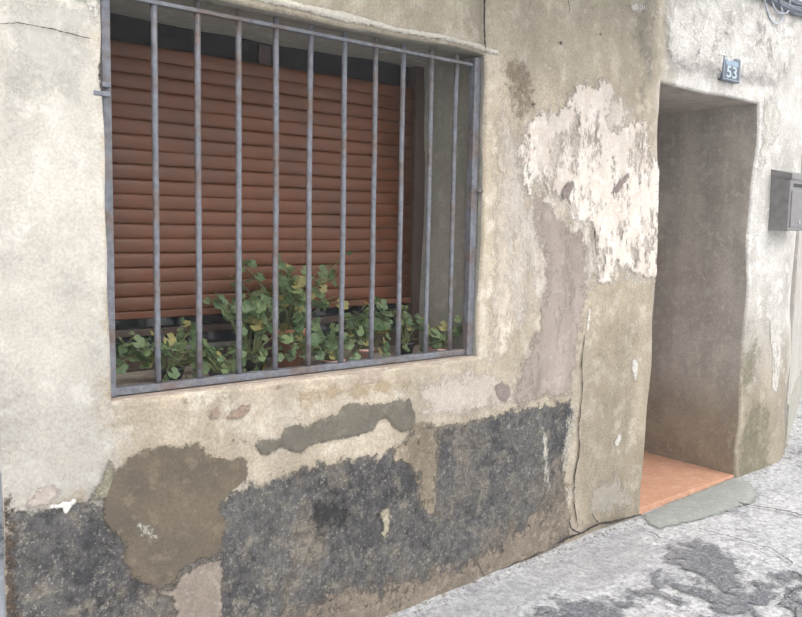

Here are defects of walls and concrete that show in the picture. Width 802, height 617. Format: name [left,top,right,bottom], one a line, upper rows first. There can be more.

crack [1,22,91,39]
crack [480,0,488,49]
peeling [391,61,659,516]
leakage [541,427,550,493]
leakage [561,408,577,471]
crack [478,334,673,575]
spalling [380,508,392,541]
crack [738,502,802,515]
spalling [161,559,226,617]
crack [700,528,802,617]